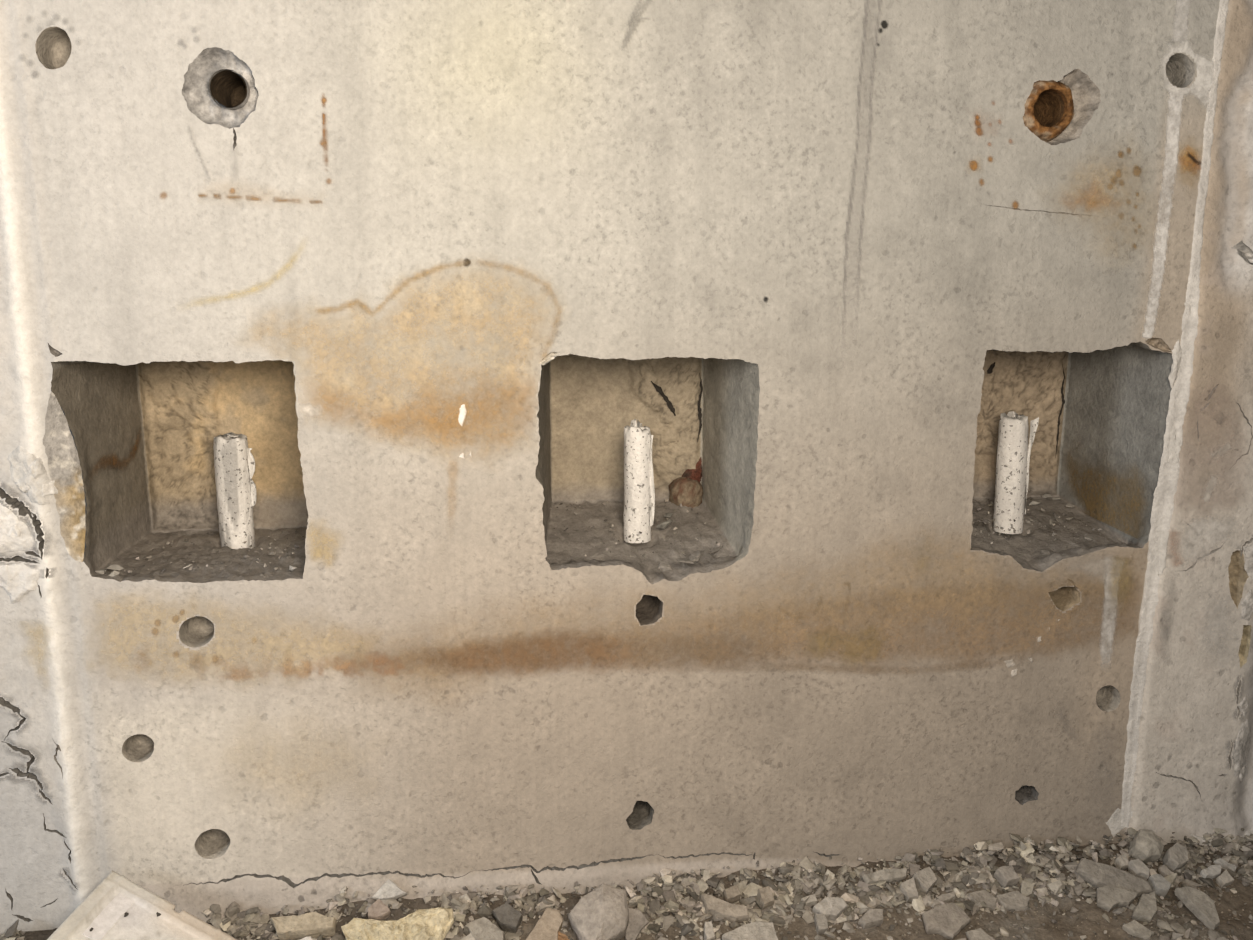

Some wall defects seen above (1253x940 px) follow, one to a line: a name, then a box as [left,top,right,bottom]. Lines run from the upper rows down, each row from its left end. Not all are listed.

spalling [1232,241,1253,265]
crack [1197,385,1253,470]
crack [0,485,52,597]
damp [581,558,1131,663]
crack [1183,538,1253,571]
spalling [1228,550,1249,609]
spalling [1238,625,1252,668]
crack [1156,676,1242,801]
crack [0,697,77,922]
crack [183,852,756,888]